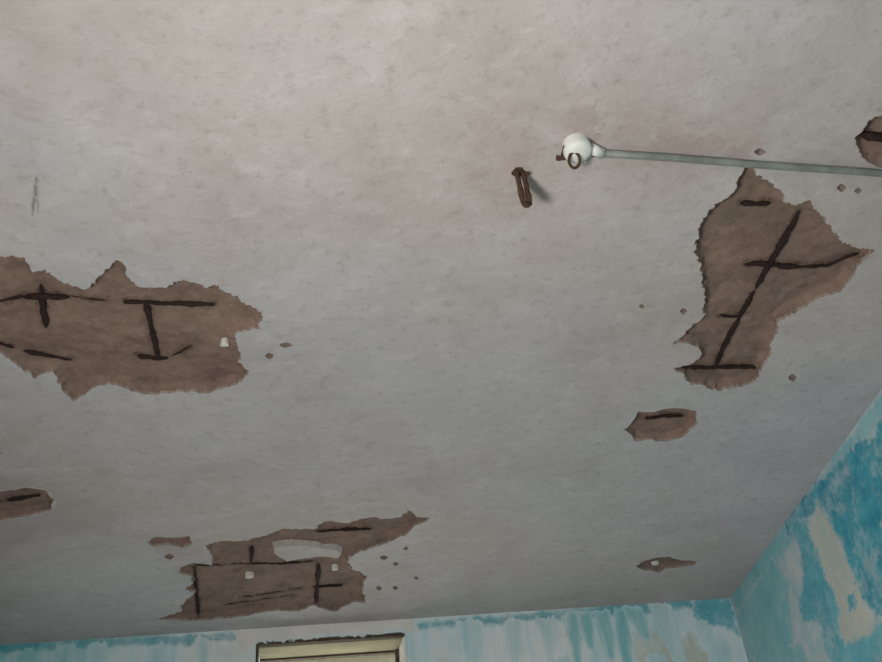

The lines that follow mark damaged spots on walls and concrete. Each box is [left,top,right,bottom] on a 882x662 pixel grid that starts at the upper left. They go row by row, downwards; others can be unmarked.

corrosion [449,70,774,222]
spalling [854,116,882,168]
spalling [673,168,874,391]
spalling [0,255,263,401]
spalling [623,408,698,442]
spalling [0,488,54,520]
spalling [148,536,192,560]
spalling [159,510,430,621]
spalling [636,557,697,573]